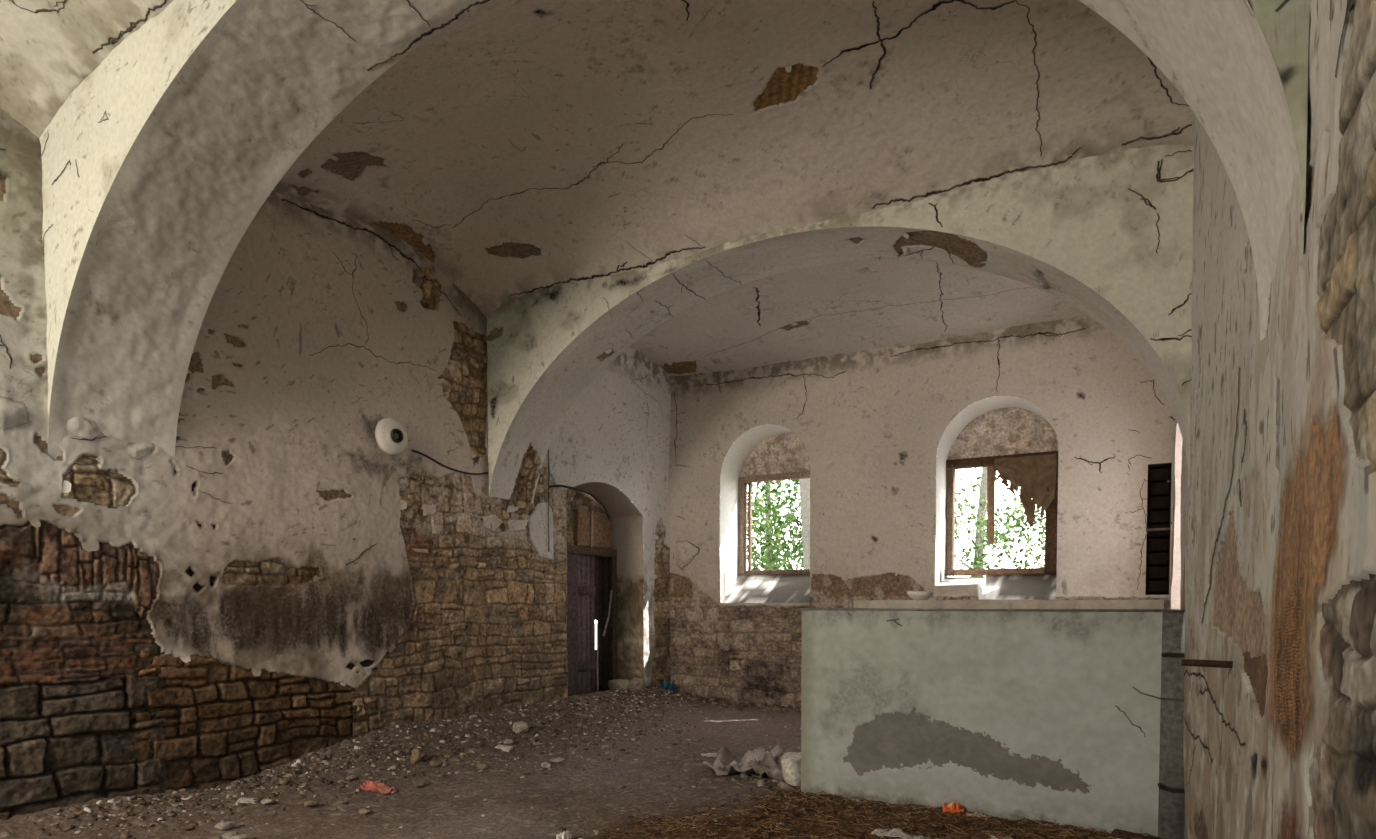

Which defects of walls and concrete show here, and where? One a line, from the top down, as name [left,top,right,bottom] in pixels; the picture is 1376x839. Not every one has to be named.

crack [9,0,67,14]
crack [92,0,167,54]
crack [300,0,490,71]
flaking render [753,63,818,112]
crack [1121,55,1194,254]
flaking render [0,281,21,320]
crack [510,0,1086,467]
flaking render [893,230,989,268]
damp [156,555,414,659]
flaking render [0,321,978,839]
flaking render [1213,505,1268,718]
flaking render [1309,573,1376,839]